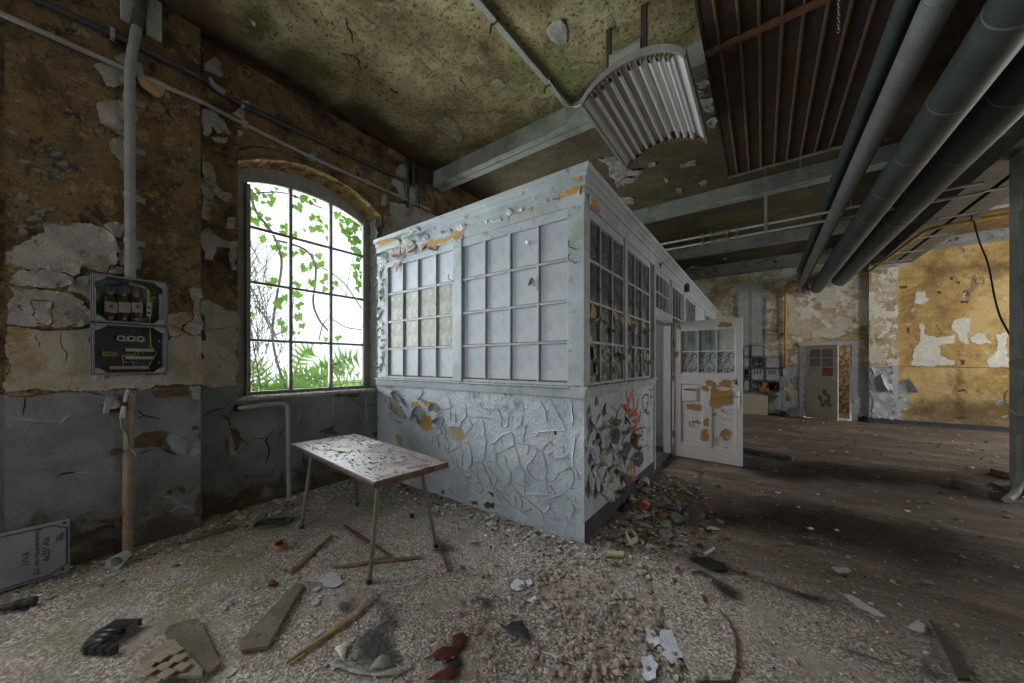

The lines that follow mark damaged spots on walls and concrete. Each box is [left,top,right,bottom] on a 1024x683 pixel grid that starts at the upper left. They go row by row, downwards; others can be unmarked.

peeling [94,53,170,173]
peeling [201,155,238,270]
peeling [599,155,656,204]
crack [7,394,72,424]
peeling [3,205,240,414]
peeling [370,164,467,446]
crack [401,387,654,527]
peeling [585,396,653,502]
peeling [686,379,739,449]
peeling [787,272,940,338]
peeling [853,314,917,421]
peeling [907,277,1009,368]